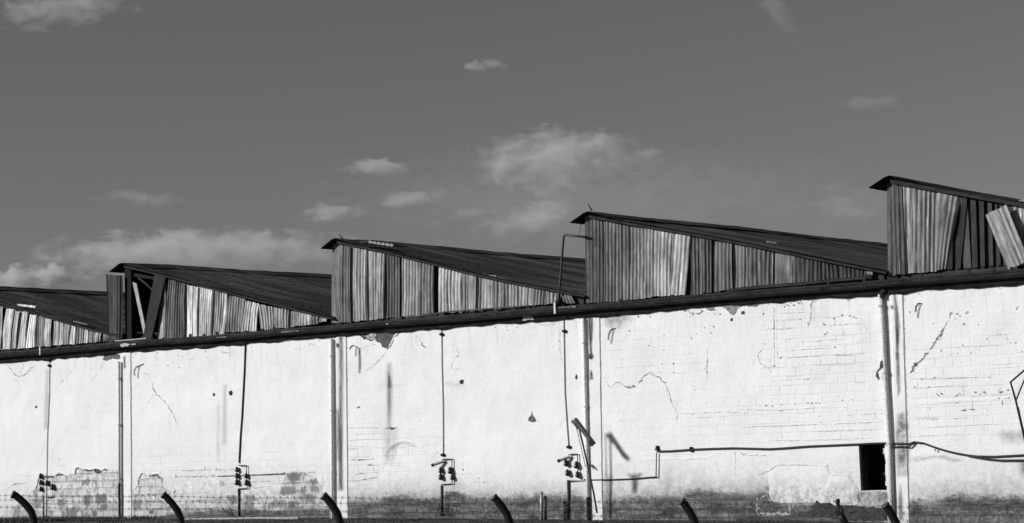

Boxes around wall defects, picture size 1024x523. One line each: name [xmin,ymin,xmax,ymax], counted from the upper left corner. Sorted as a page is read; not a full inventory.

flaking render [360,323,399,350]
crack [910,313,1008,436]
crack [607,353,885,456]
flaking render [13,459,118,518]
flaking render [755,495,886,520]